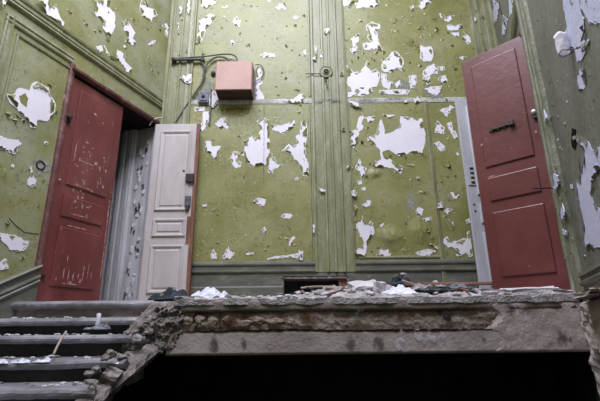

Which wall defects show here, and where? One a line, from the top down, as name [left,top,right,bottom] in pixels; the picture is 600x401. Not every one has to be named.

peeling [92,0,136,73]
peeling [195,0,247,45]
peeling [563,0,600,92]
peeling [6,81,58,128]
peeling [340,0,474,196]
peeling [230,117,309,181]
peeling [570,128,600,248]
peeling [0,233,29,261]
peeling [353,200,384,258]
peeling [402,218,473,257]
spalling [178,311,299,331]
spalling [402,309,498,329]